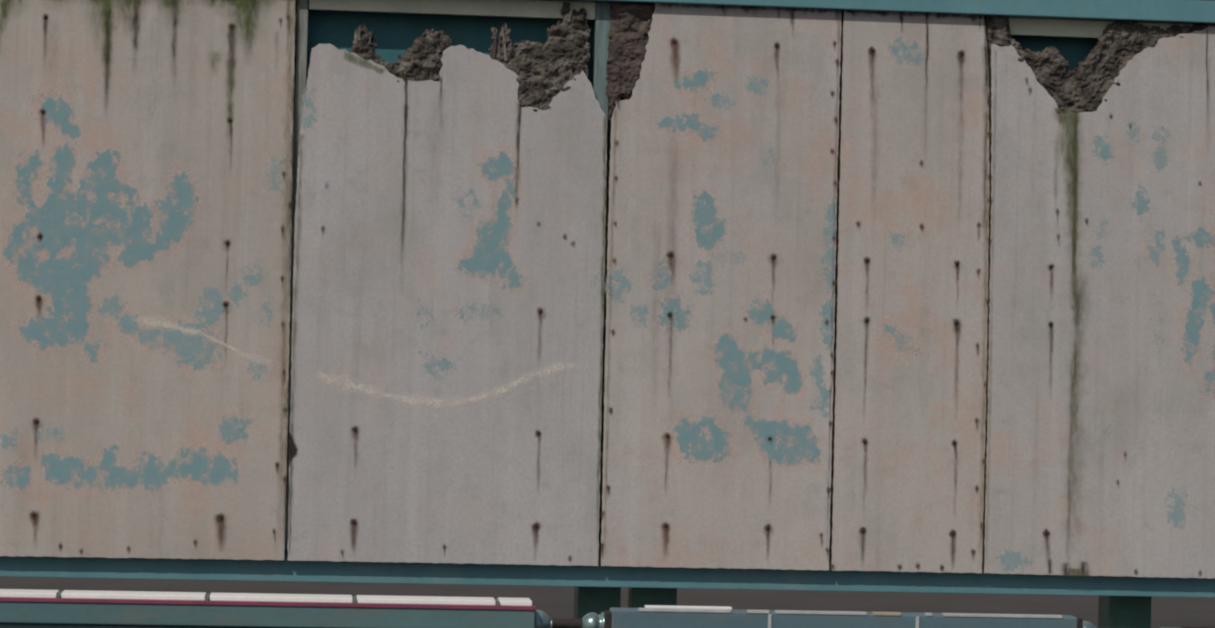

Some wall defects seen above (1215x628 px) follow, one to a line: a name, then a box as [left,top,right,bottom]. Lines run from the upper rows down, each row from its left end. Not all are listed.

water stain [102,0,110,86]
peeling [0,86,263,373]
peeling [457,146,522,289]
peeling [594,259,691,331]
peeling [672,190,836,468]
water stain [1059,110,1077,252]
peeling [1147,227,1215,393]
peeling [0,416,252,494]